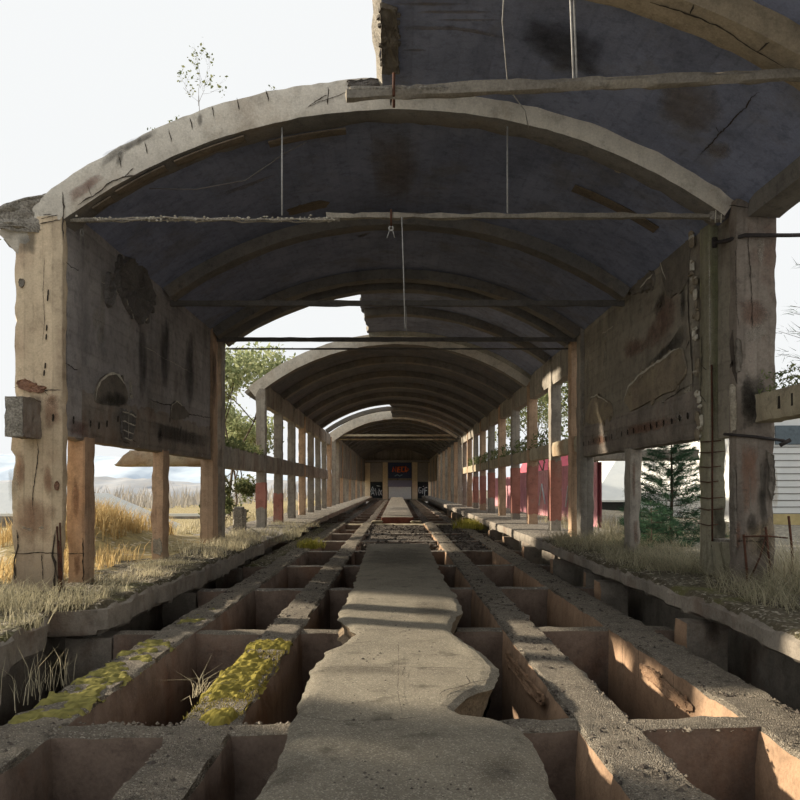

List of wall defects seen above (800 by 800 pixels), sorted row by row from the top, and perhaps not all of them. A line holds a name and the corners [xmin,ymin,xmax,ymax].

spalling [347,2,401,87]
crack [650,2,780,65]
crack [701,92,759,154]
crack [40,144,159,237]